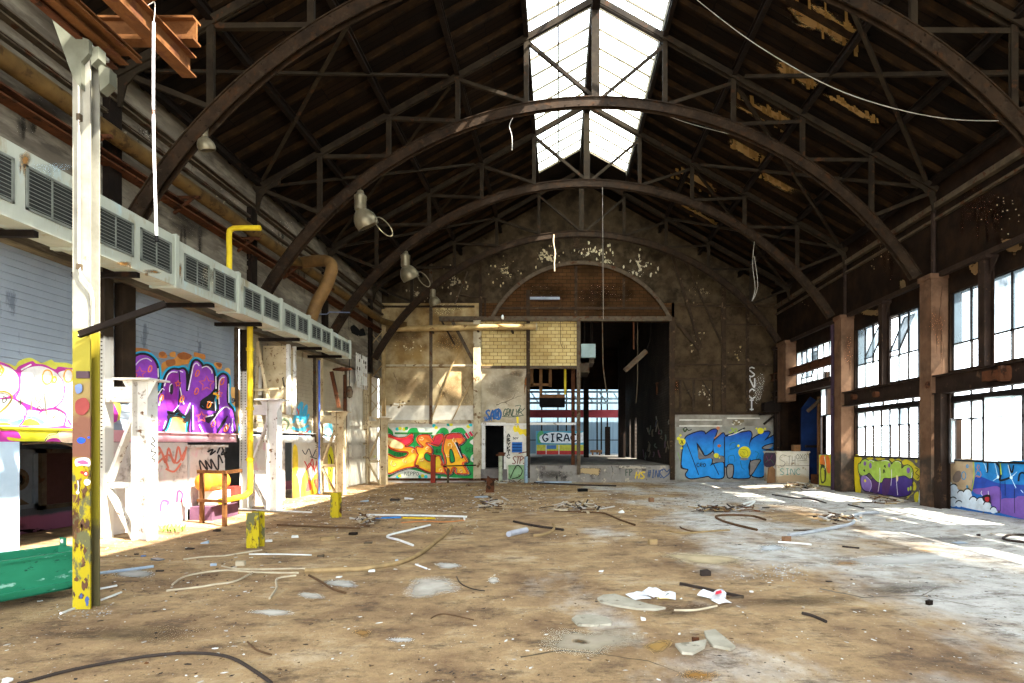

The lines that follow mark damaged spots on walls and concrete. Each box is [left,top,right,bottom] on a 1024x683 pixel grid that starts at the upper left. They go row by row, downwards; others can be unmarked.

peeling [535,241,659,277]